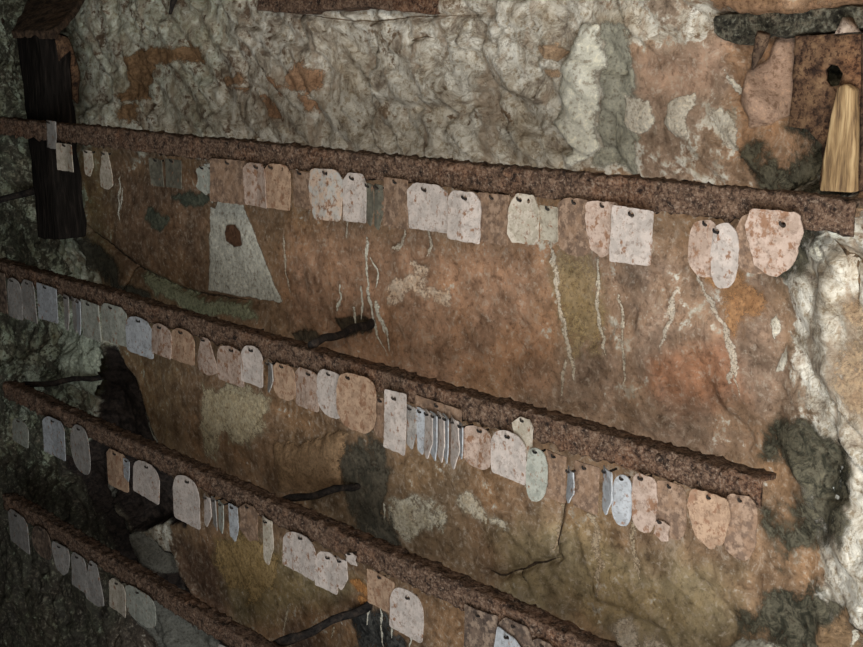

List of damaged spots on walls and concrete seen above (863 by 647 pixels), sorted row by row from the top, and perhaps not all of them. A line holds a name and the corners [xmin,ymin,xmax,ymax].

rust [553,254,605,358]
rust [694,270,767,337]
crack [836,240,863,291]
water stain [759,418,853,560]
crack [491,503,566,581]
water stain [736,582,844,647]